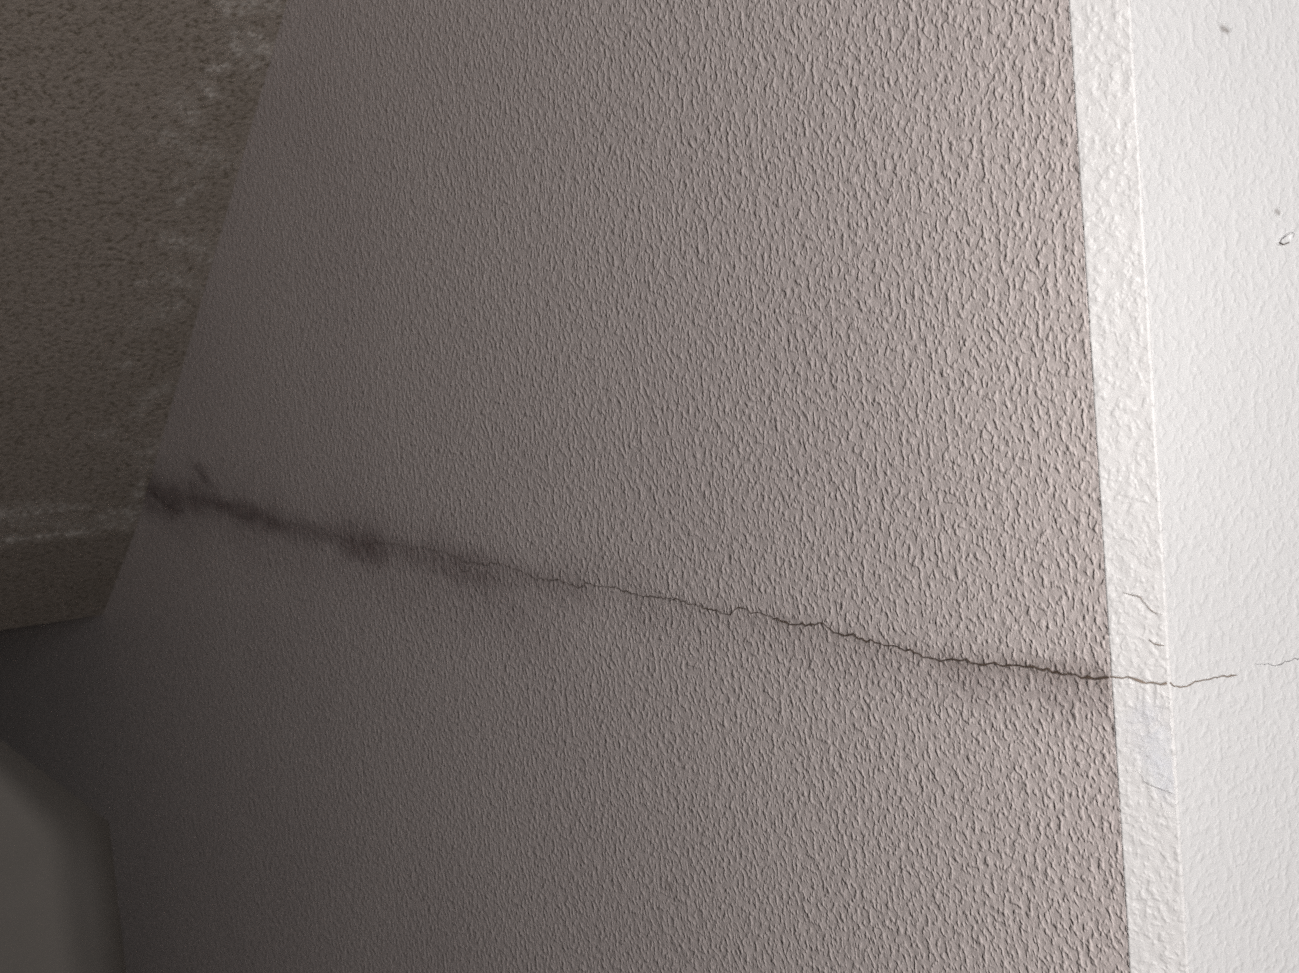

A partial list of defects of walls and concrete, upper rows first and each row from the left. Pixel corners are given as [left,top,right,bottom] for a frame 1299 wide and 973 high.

crack [549,578,1236,688]